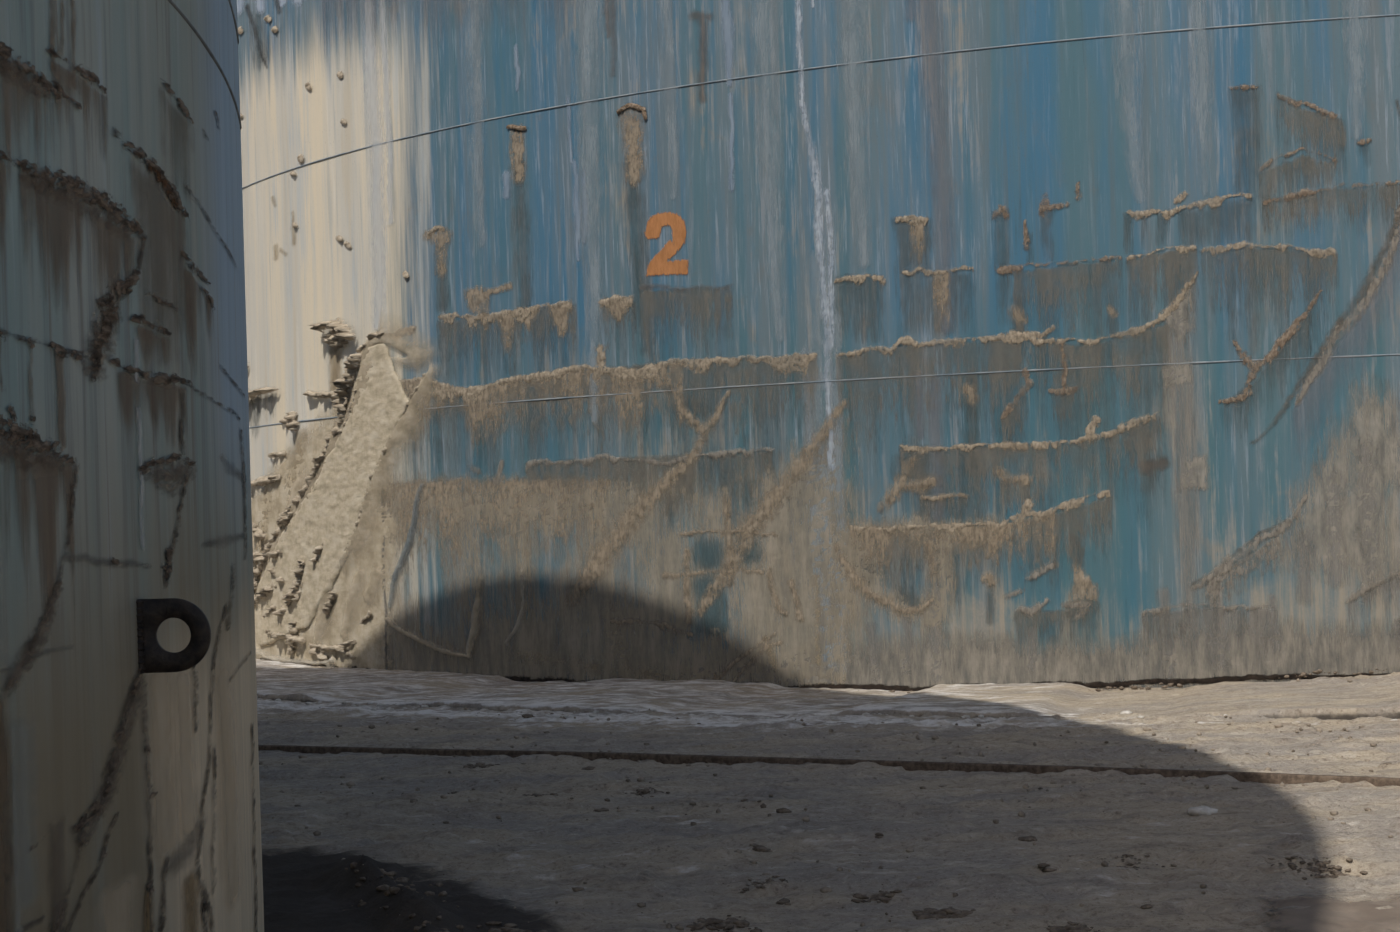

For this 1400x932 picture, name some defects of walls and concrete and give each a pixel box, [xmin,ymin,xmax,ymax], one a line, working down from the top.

leakage [796,0,814,132]
peeling [438,283,572,348]
corrosion [506,124,526,182]
corrosion [616,103,647,186]
leakage [804,149,842,369]
peeling [834,272,1198,419]
peeling [993,181,1338,274]
crack [1218,205,1400,405]
leakage [15,451,74,601]
crack [0,242,145,689]
peeling [400,344,817,602]
crack [145,369,247,932]